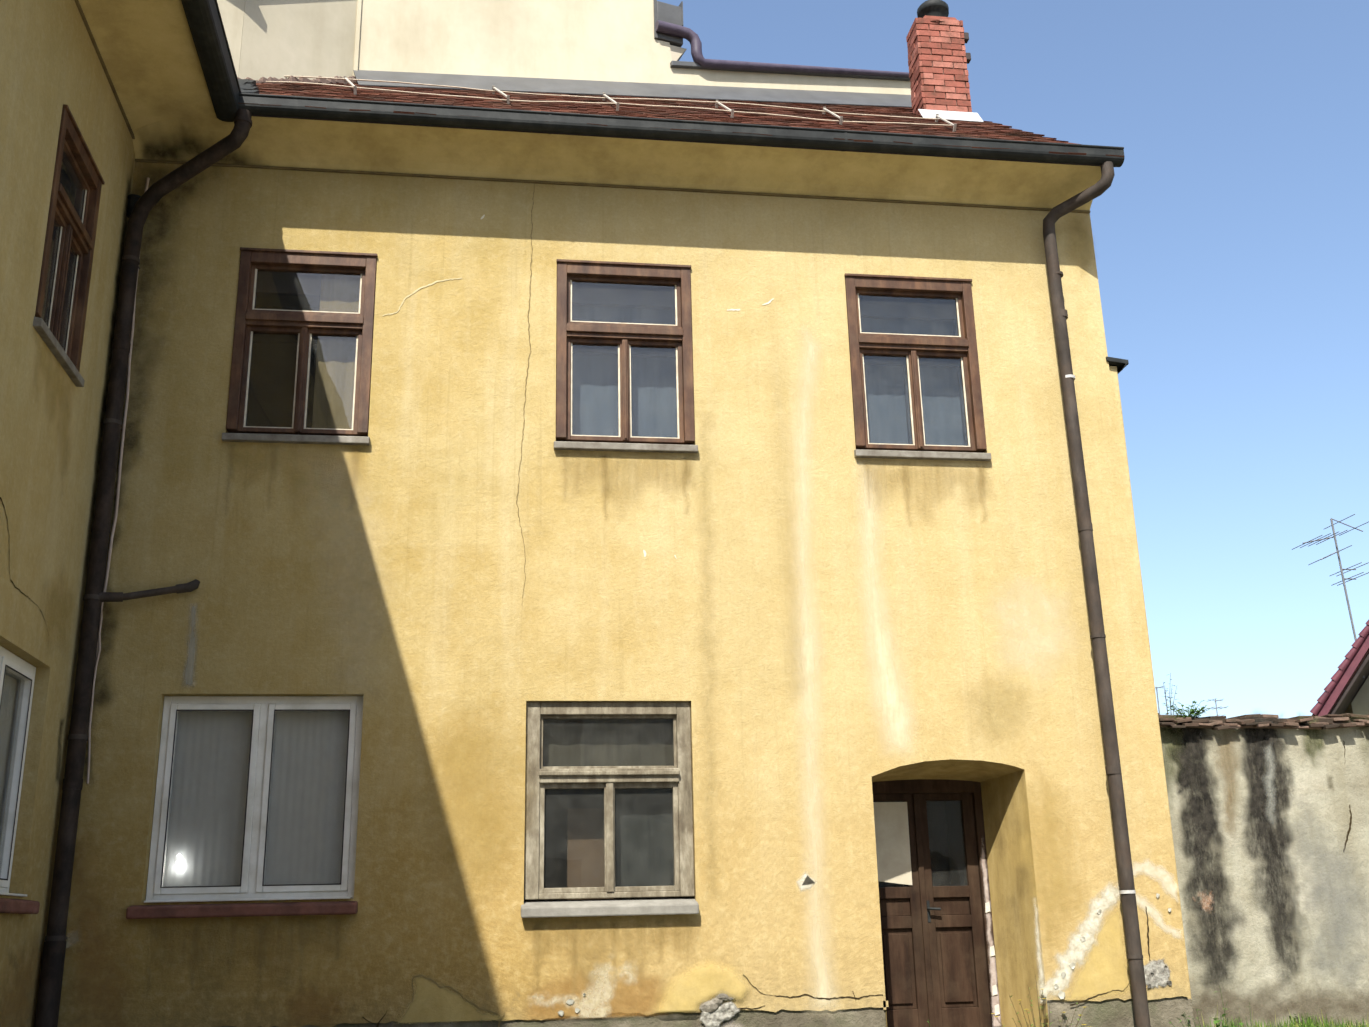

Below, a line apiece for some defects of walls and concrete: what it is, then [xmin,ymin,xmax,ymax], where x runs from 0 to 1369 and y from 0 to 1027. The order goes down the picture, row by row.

damp [87,136,206,569]
crack [516,184,535,602]
crack [0,497,48,631]
damp [873,592,905,744]
crack [1343,804,1352,852]
peeling [1133,862,1179,937]
crack [362,975,504,1027]
spalling [699,993,740,1027]
crack [739,974,883,1010]
peeling [1036,886,1119,1000]
spalling [1144,959,1172,988]